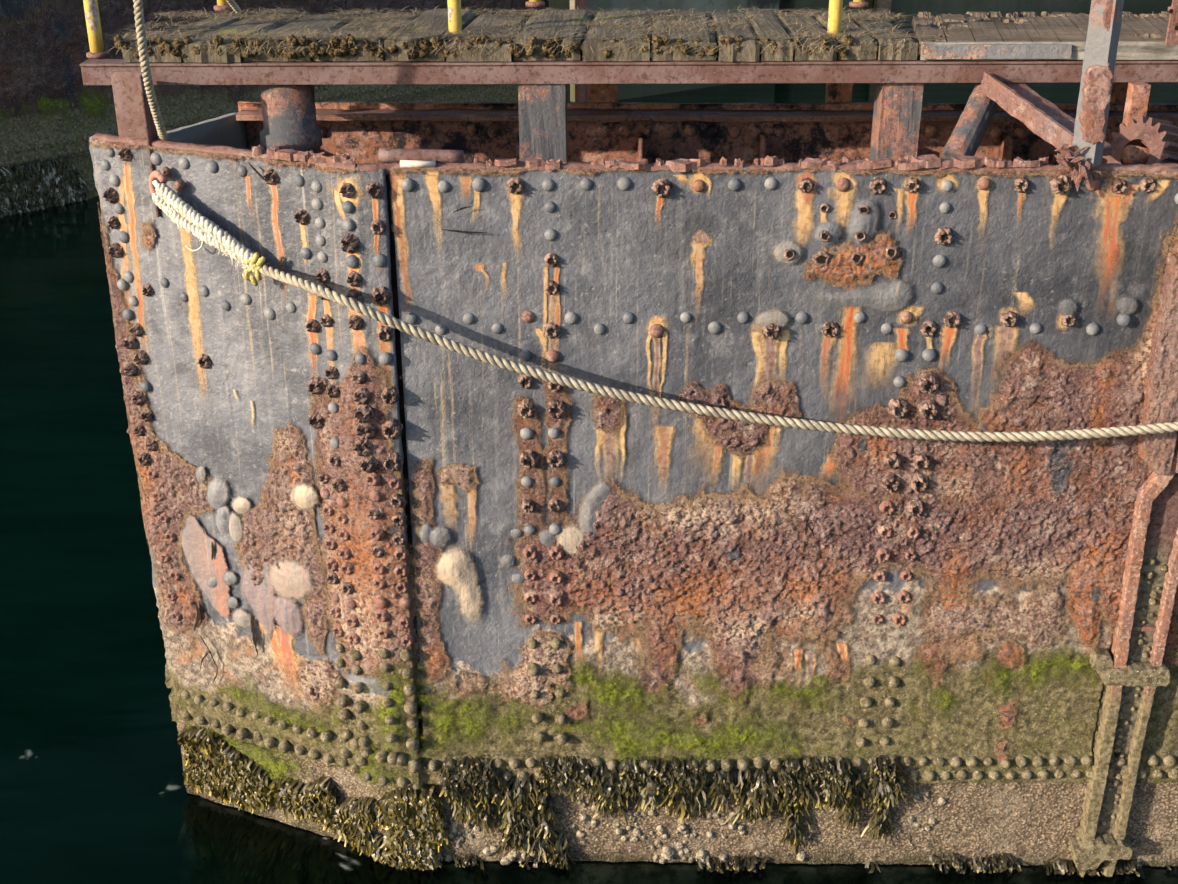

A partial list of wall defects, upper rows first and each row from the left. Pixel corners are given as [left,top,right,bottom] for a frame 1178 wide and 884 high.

corrosion [0,0,549,127]
corrosion [1078,63,1113,144]
corrosion [89,139,380,254]
corrosion [270,185,284,267]
corrosion [389,168,534,301]
corrosion [674,170,1073,242]
corrosion [1089,171,1178,272]
corrosion [98,164,214,633]
corrosion [505,224,1178,704]
peeling [181,515,275,640]
spalling [581,608,647,639]
spalling [750,639,797,702]